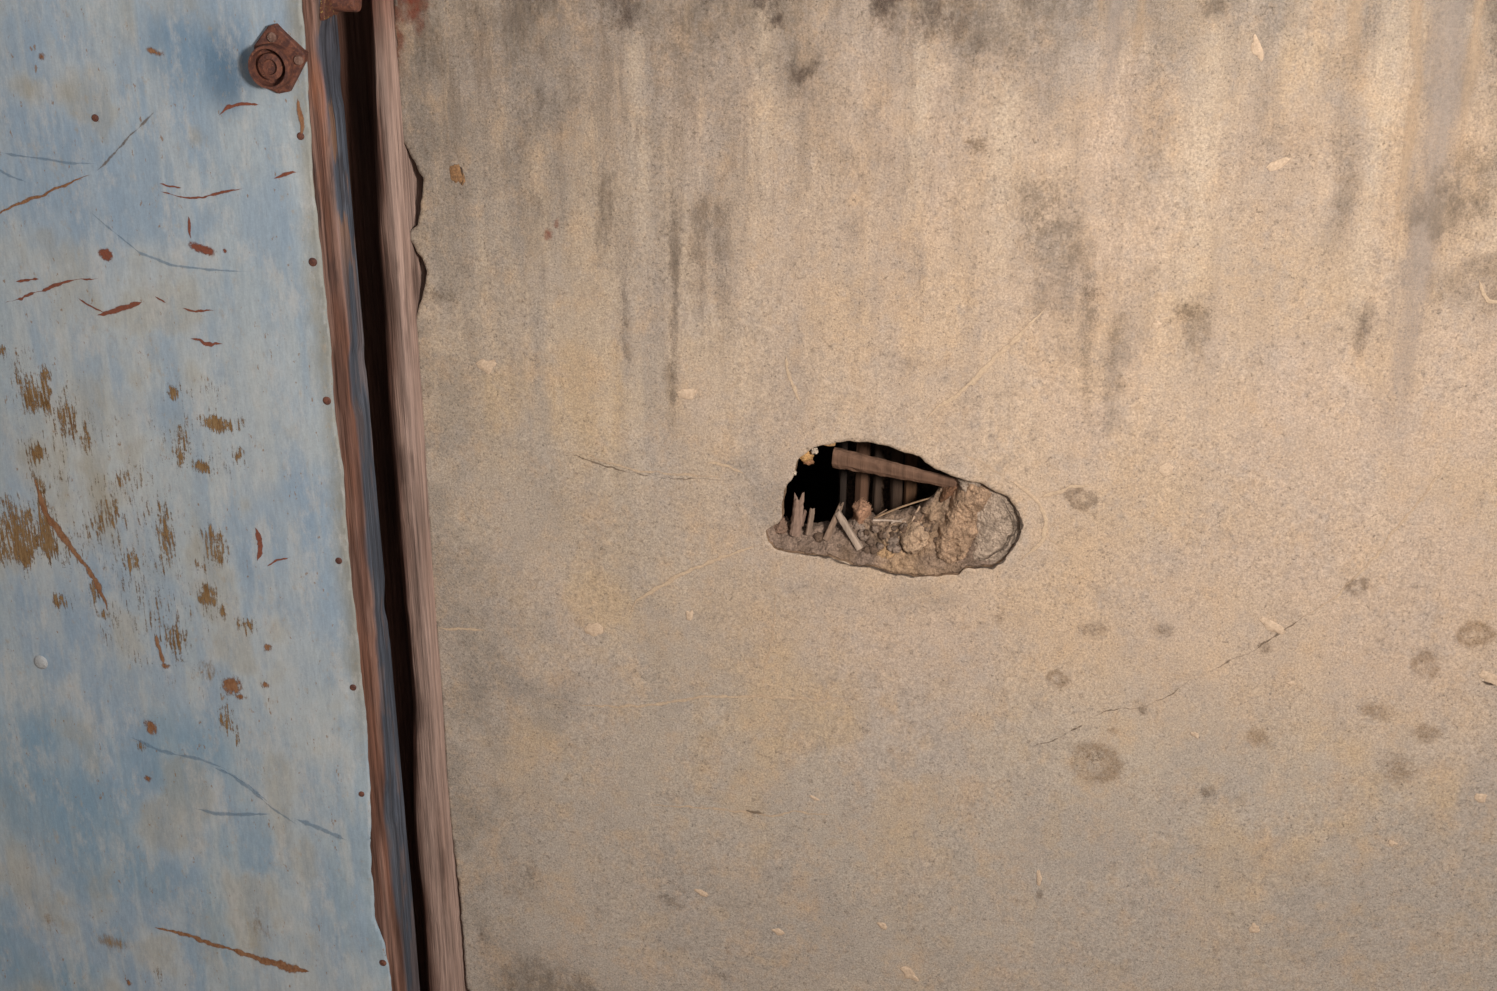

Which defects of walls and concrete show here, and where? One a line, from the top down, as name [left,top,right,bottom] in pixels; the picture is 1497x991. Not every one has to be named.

rust [0,345,253,669]
hole [767,441,1024,578]
rust [137,721,157,750]
rust [208,672,243,746]
rust [155,927,308,973]